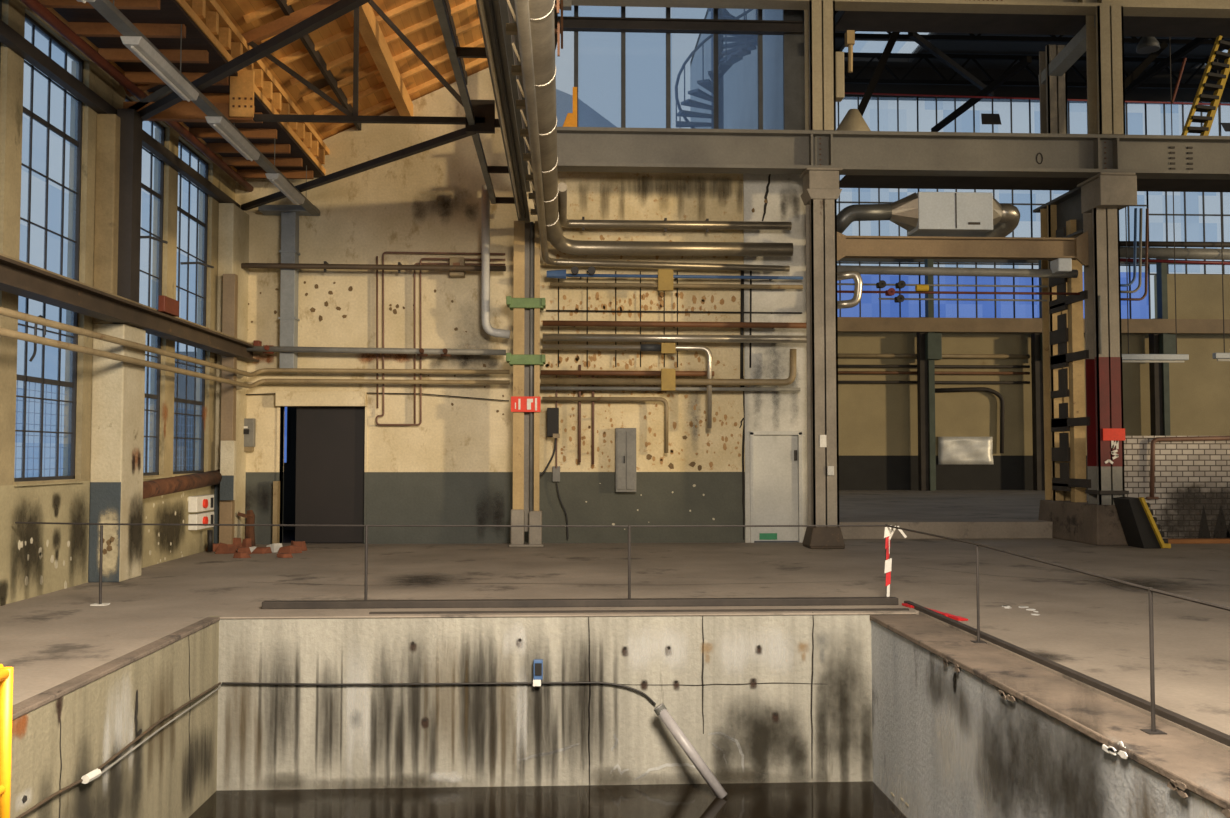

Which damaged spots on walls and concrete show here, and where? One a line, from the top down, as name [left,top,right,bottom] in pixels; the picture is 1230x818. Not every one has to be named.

leakage [0,503,85,606]
leakage [130,501,143,558]
leakage [78,761,120,818]
leakage [316,686,342,751]
leakage [372,672,435,765]
leakage [463,671,495,754]
leakage [519,671,602,772]
spalling [10,615,1230,818]
leakage [717,666,872,780]
leakage [985,716,1097,818]